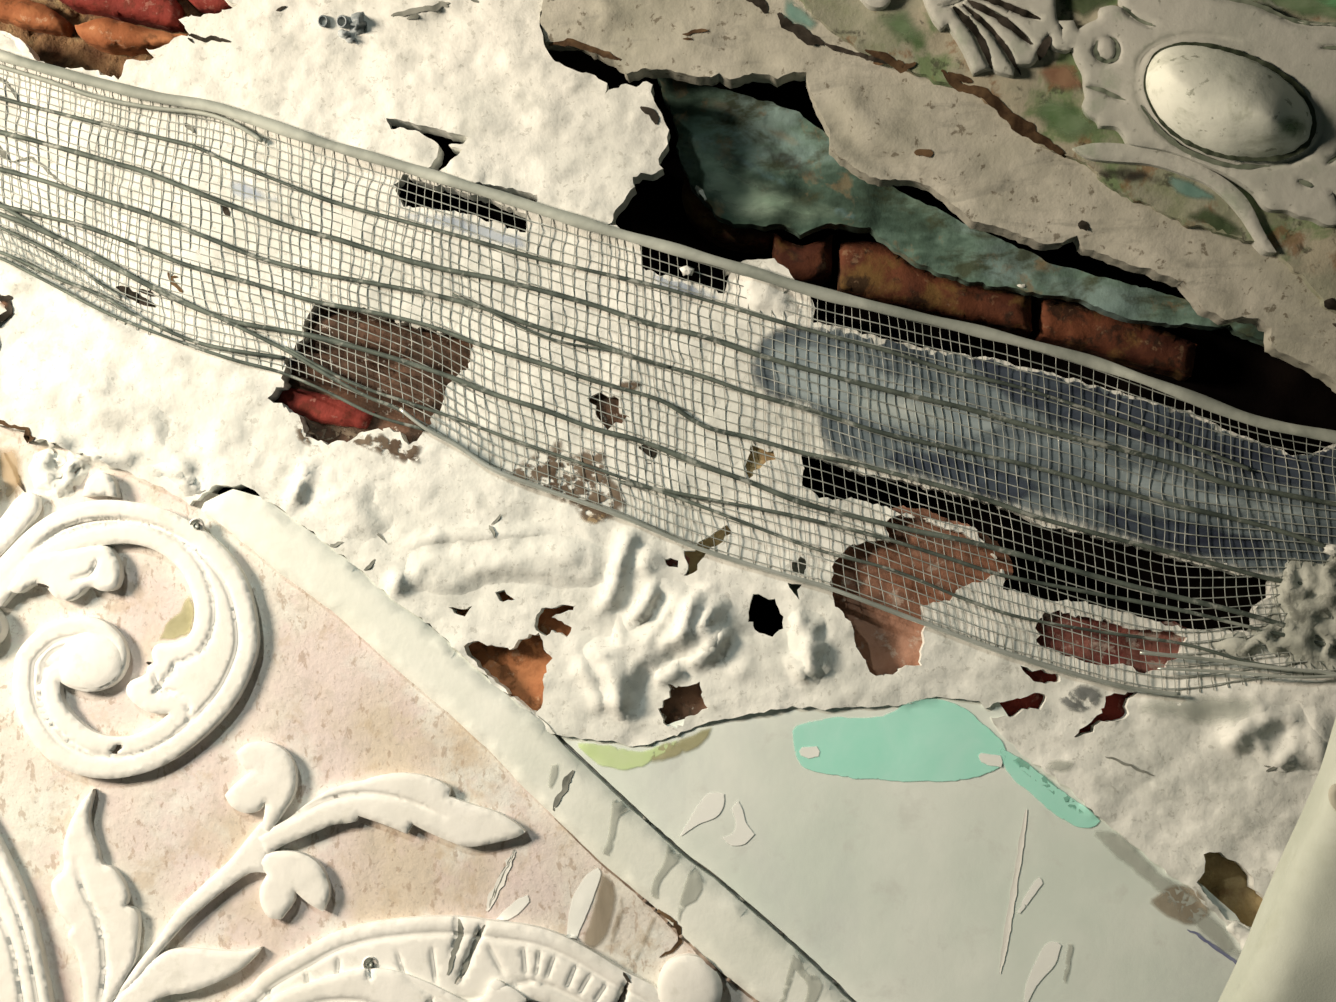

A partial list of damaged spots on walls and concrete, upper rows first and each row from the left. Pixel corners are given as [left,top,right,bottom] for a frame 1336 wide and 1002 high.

flaking render [0,0,232,80]
spalling [629,155,1336,451]
flaking render [274,306,473,444]
flaking render [589,393,630,430]
flaking render [830,505,1013,676]
flaking render [468,605,574,711]
flaking render [660,682,707,724]
flaking render [1035,610,1188,673]
flaking render [1198,852,1263,950]